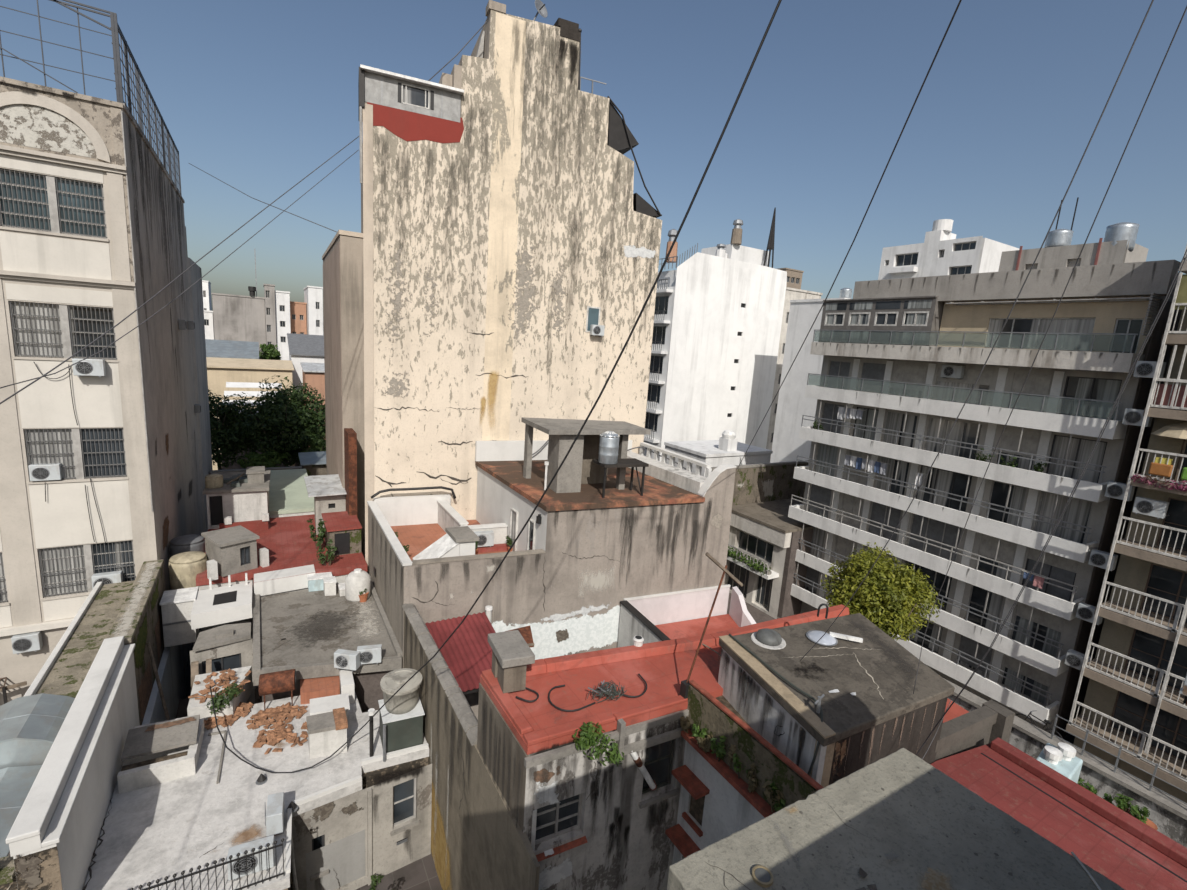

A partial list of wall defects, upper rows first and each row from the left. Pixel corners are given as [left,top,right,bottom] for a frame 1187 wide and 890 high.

leakage [559,39,578,82]
crack [378,405,477,413]
leakage [481,374,498,413]
crack [439,438,497,446]
crack [376,472,471,487]
leakage [651,502,711,563]
leakage [374,617,683,890]